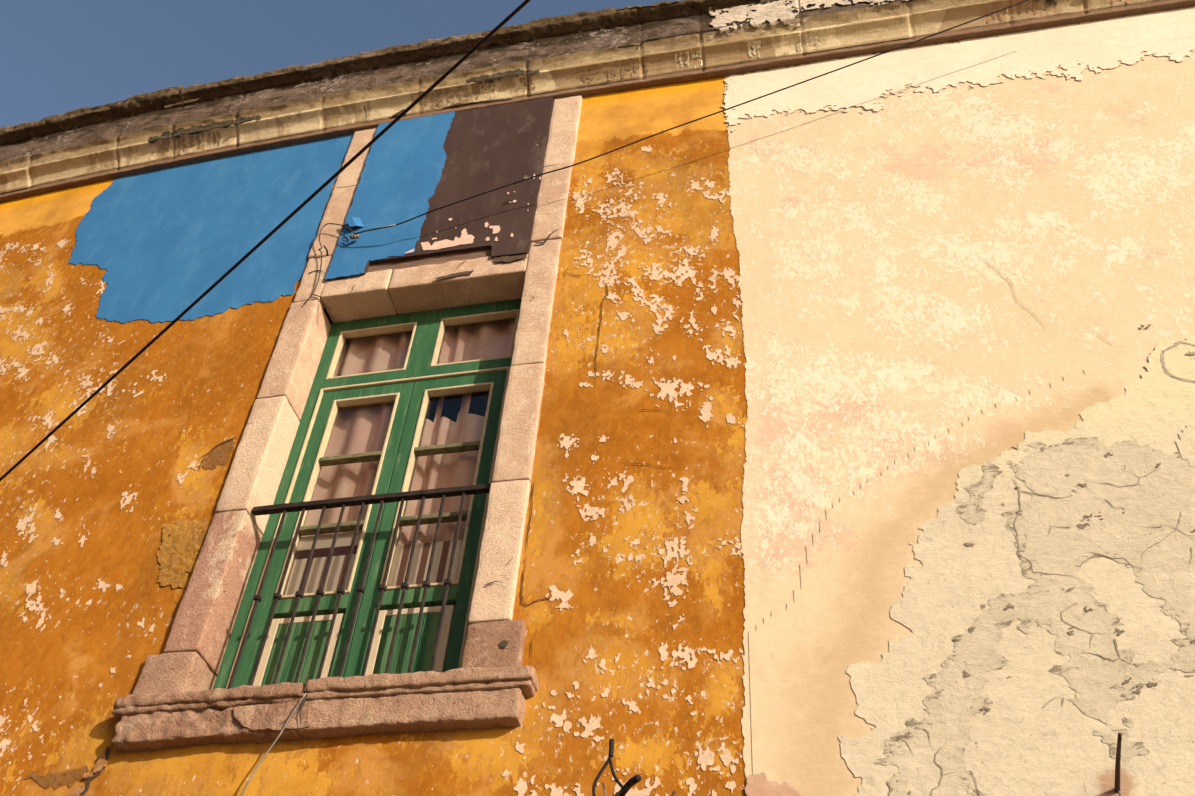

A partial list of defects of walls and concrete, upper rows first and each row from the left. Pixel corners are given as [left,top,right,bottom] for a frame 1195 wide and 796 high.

peeling [709,0,909,39]
peeling [721,6,1195,132]
peeling [405,218,514,253]
peeling [569,167,744,428]
crack [1160,341,1195,383]
peeling [27,369,167,450]
crack [1097,468,1157,507]
peeling [562,472,743,715]
spalling [838,337,1195,796]
crack [1007,477,1195,665]
peeling [543,681,608,743]
corrosion [1083,758,1148,796]